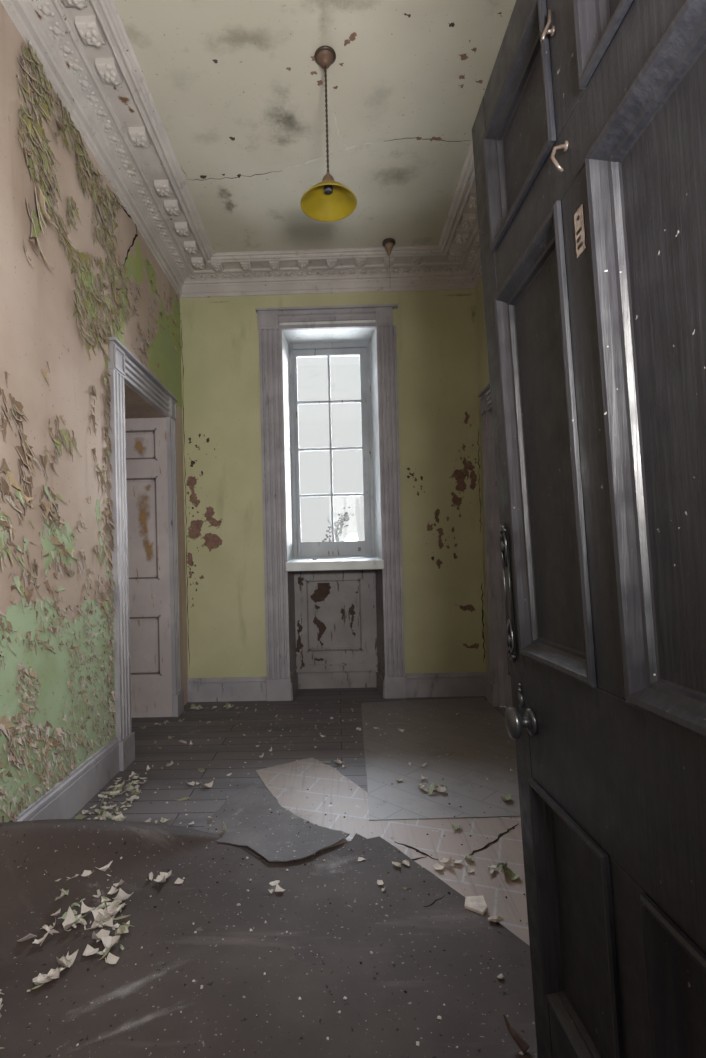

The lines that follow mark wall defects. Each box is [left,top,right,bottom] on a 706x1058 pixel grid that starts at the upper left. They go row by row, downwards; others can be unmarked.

crack [181,106,467,181]
peeling [0,35,182,822]
peeling [185,434,223,607]
peeling [426,444,477,569]
peeling [296,577,331,669]
peeling [341,591,358,636]